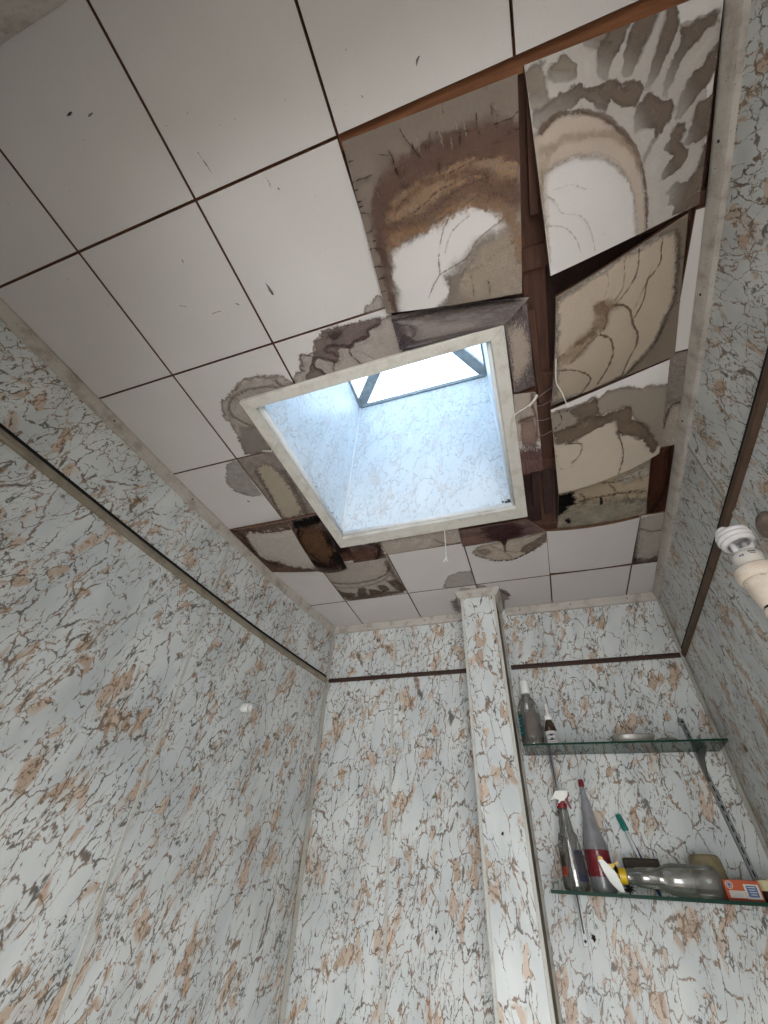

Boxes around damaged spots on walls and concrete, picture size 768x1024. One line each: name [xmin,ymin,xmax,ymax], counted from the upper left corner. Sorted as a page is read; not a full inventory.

water stain [221,40,720,601]
water stain [587,6,718,74]